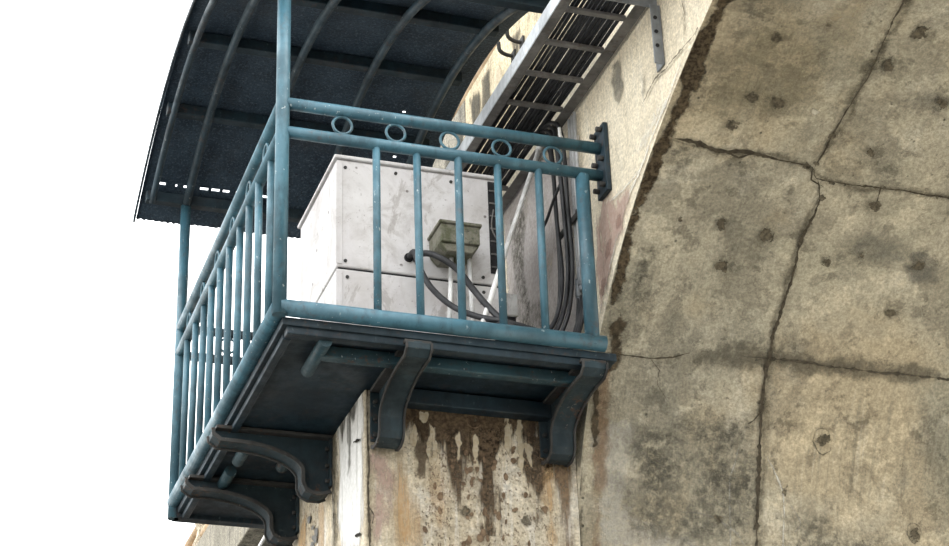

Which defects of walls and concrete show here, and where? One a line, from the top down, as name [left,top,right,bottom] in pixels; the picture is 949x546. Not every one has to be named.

crack [642,0,699,104]
water stain [599,0,734,316]
crack [675,0,949,546]
water stain [608,315,627,373]
crack [607,352,688,398]
corrosion [547,464,571,546]
water stain [629,420,755,546]